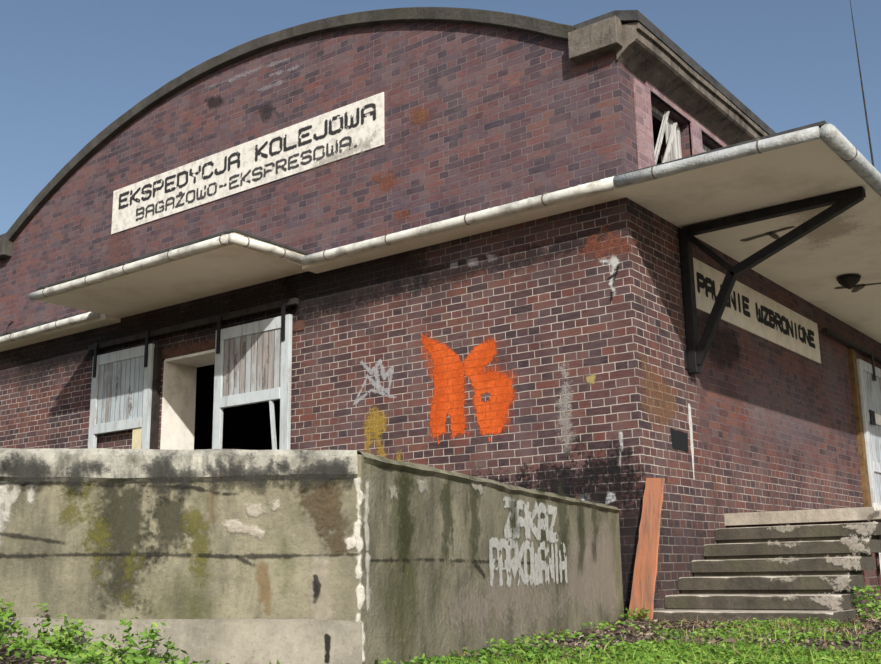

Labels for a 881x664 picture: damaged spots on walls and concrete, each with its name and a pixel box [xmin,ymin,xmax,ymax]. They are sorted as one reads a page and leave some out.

leakage [0,452,51,532]
leakage [59,460,110,523]
leakage [88,448,357,606]
leakage [309,557,332,620]
spalling [299,477,371,662]
spalling [810,503,881,611]